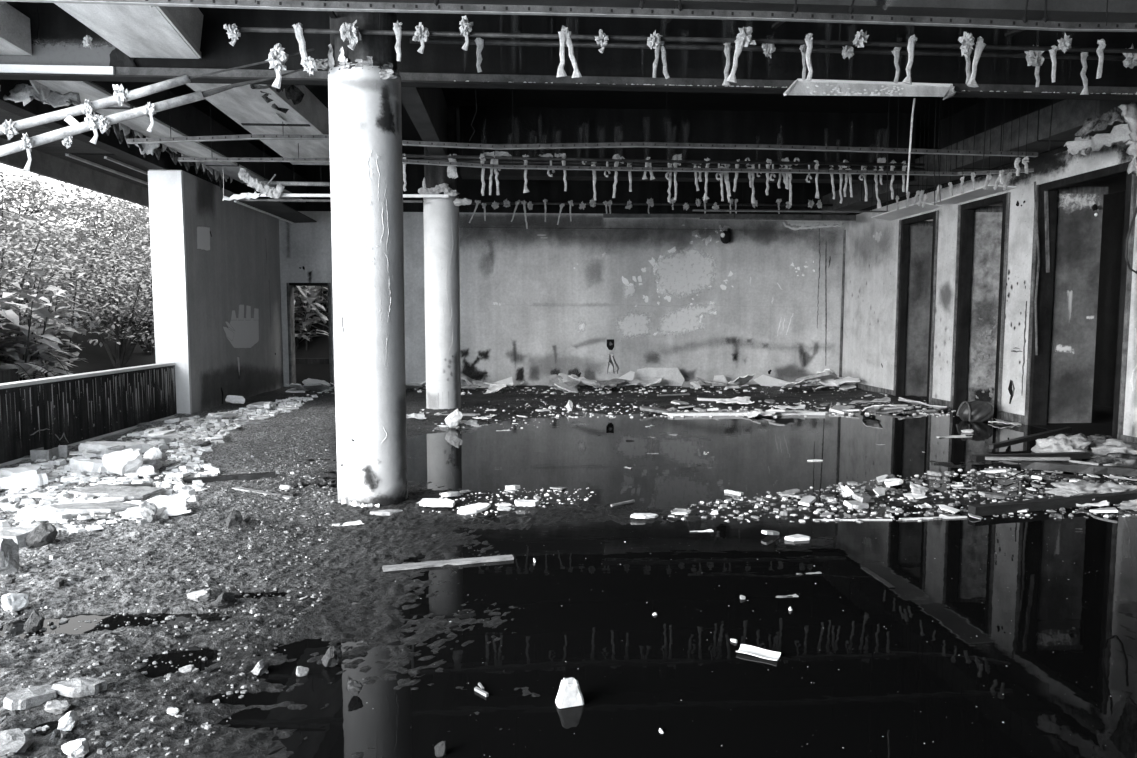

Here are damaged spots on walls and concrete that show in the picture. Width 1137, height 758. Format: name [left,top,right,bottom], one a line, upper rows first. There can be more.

peeling [607,224,733,374]
damp [777,366,809,378]